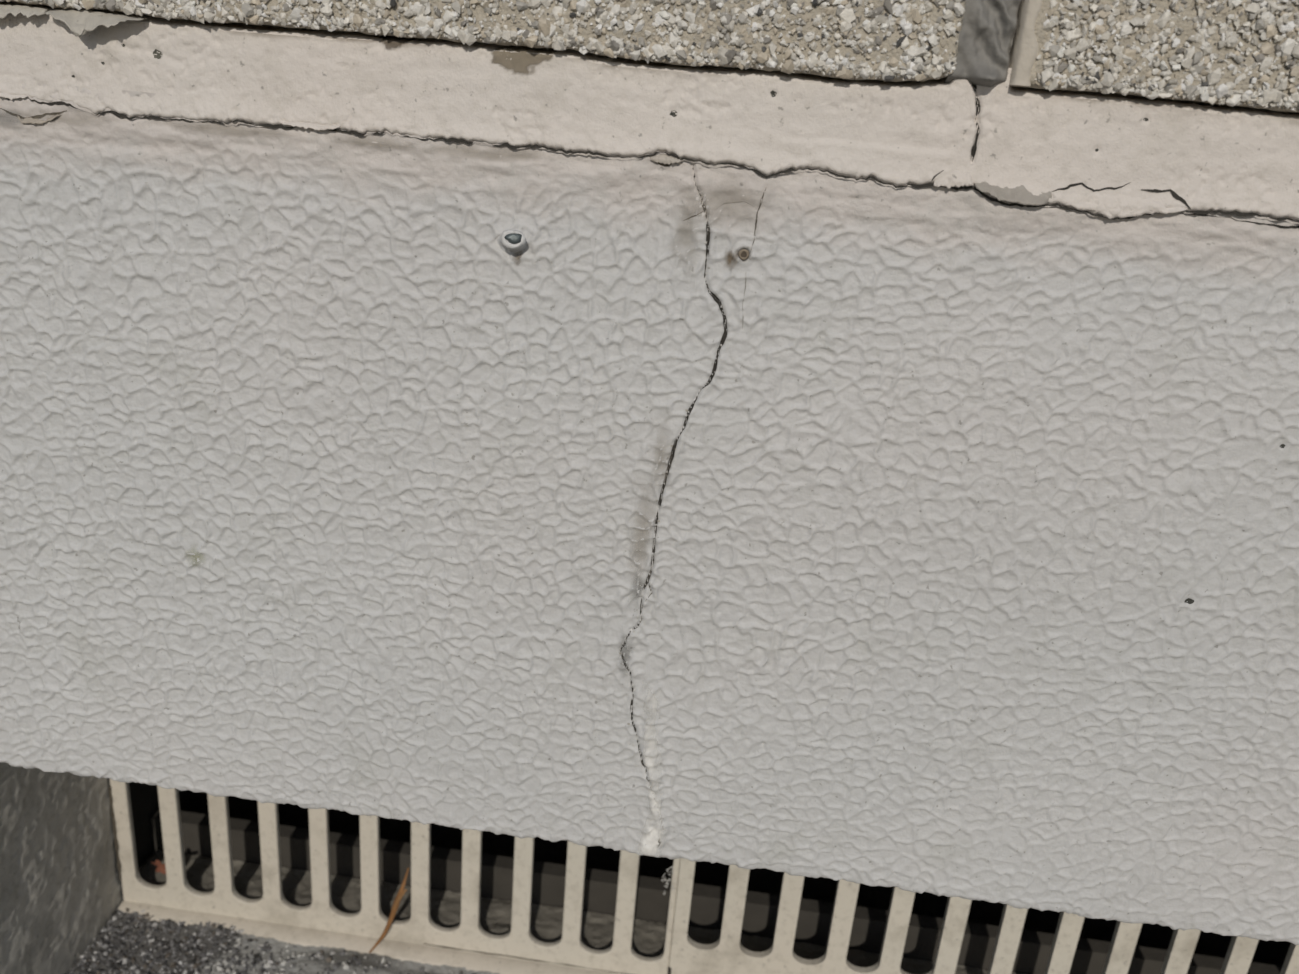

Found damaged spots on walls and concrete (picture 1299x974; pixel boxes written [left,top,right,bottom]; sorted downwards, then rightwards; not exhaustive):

crack [0,98,297,129]
peeling [934,170,1188,219]
crack [328,84,1299,846]